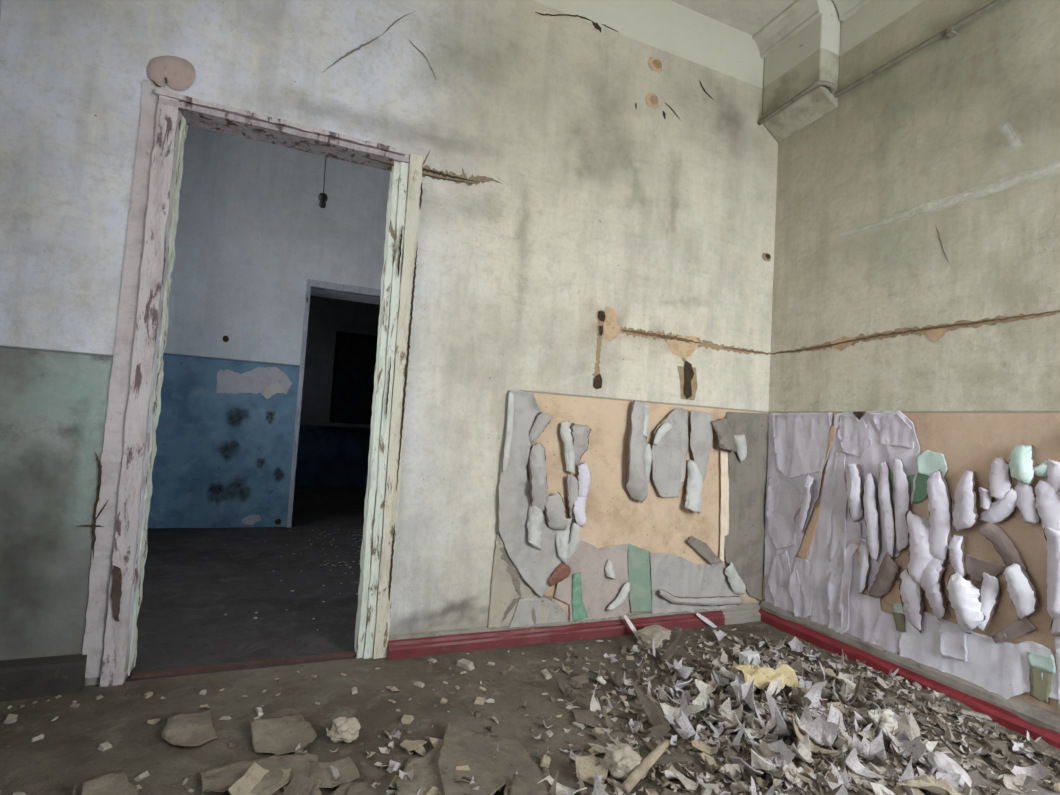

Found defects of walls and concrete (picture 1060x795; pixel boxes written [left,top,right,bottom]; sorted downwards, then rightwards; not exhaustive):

crack [322,12,437,80]
crack [535,12,618,33]
flaking render [82,55,195,678]
peeling [216,367,292,399]
crack [362,150,502,490]
crack [81,452,108,559]
crack [387,524,395,601]
peeling [488,390,1060,708]